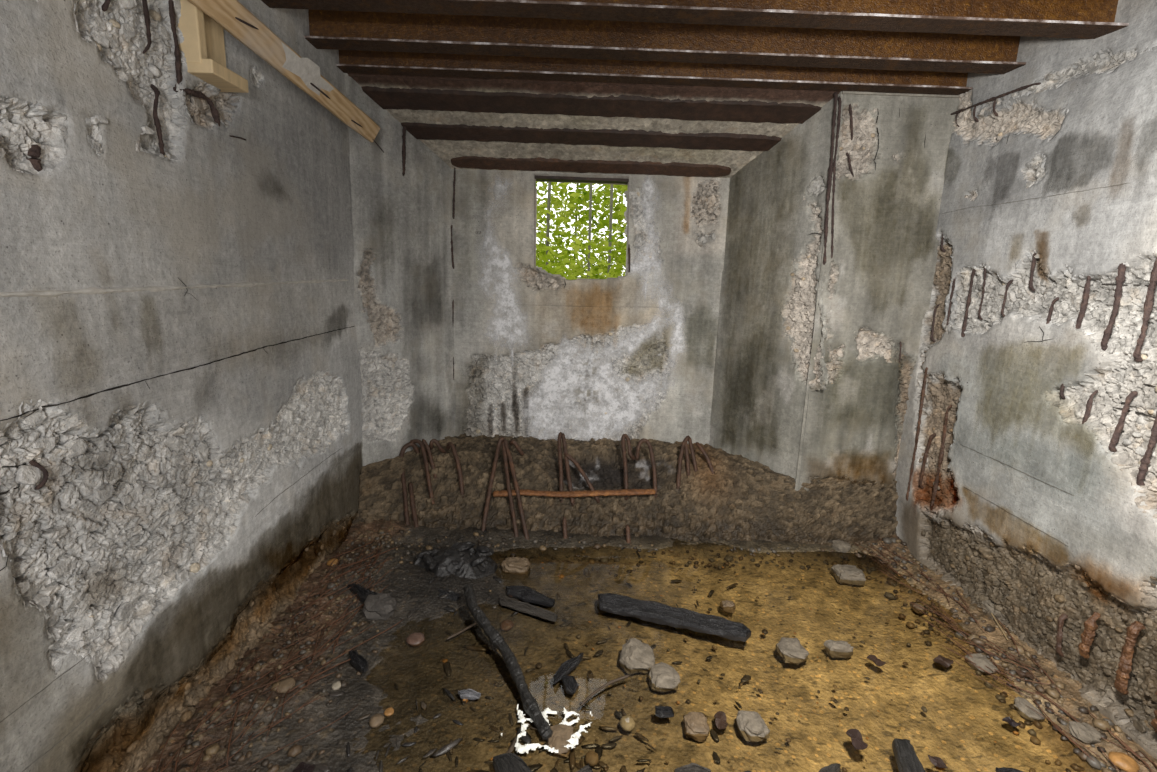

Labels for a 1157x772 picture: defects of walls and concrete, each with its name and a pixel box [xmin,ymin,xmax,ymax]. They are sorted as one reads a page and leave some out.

spalling [0,95,68,176]
spalling [73,0,240,164]
rust [823,92,854,265]
water stain [503,180,684,441]
rust [1101,263,1126,351]
rust [1133,257,1157,362]
crack [0,326,354,421]
spalling [0,246,415,684]
spalling [463,321,676,441]
spalling [780,102,1157,754]
rust [1108,391,1138,452]
rust [1136,411,1157,486]